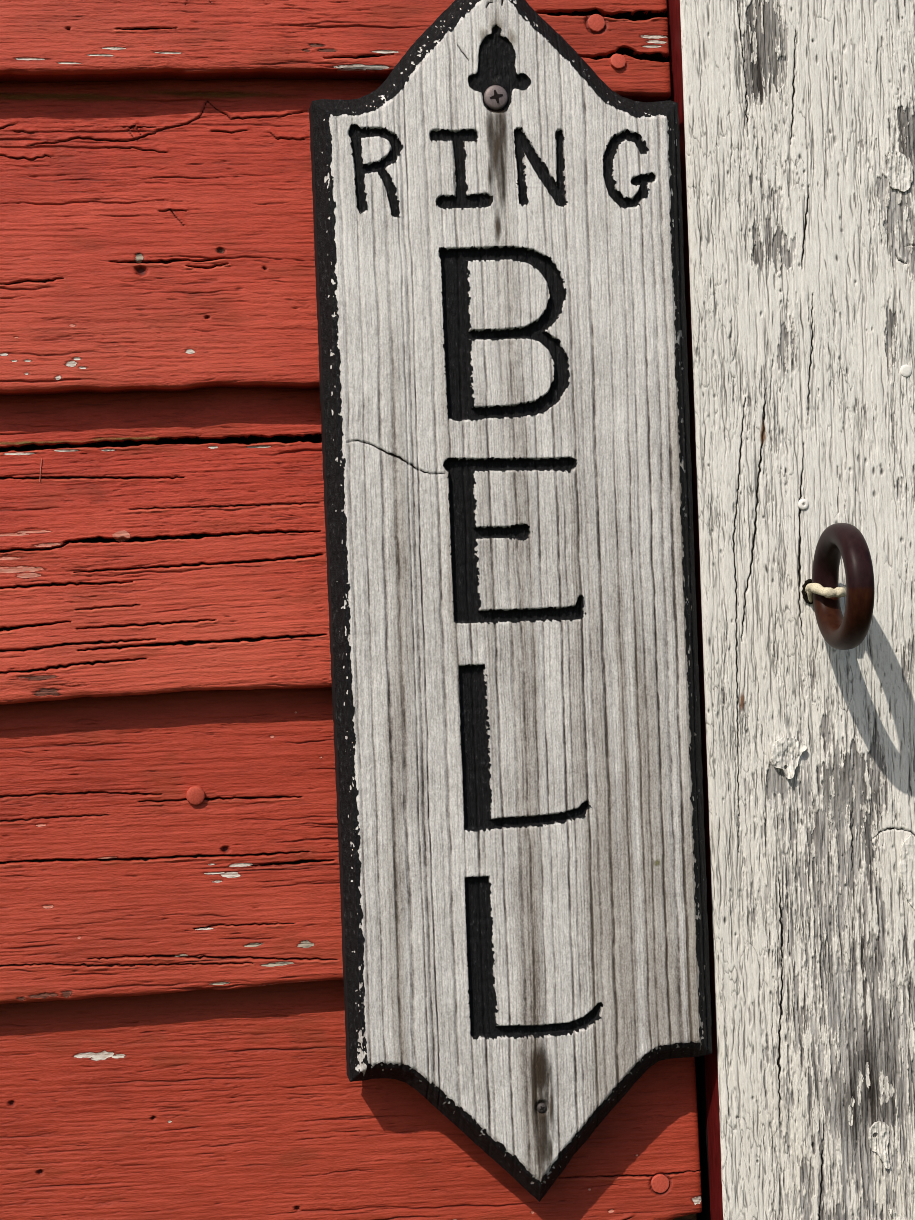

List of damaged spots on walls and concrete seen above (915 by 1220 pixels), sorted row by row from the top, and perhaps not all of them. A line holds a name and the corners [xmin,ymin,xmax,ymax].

crack [118,0,211,30]
crack [324,53,385,61]
peeling [744,0,784,104]
crack [0,100,304,160]
peeling [883,105,915,257]
crack [0,434,442,674]
crack [733,390,766,852]
peeling [766,737,807,800]
peeling [810,739,884,871]
peeling [900,835,915,910]
crack [776,877,784,1118]
crack [817,1124,825,1220]